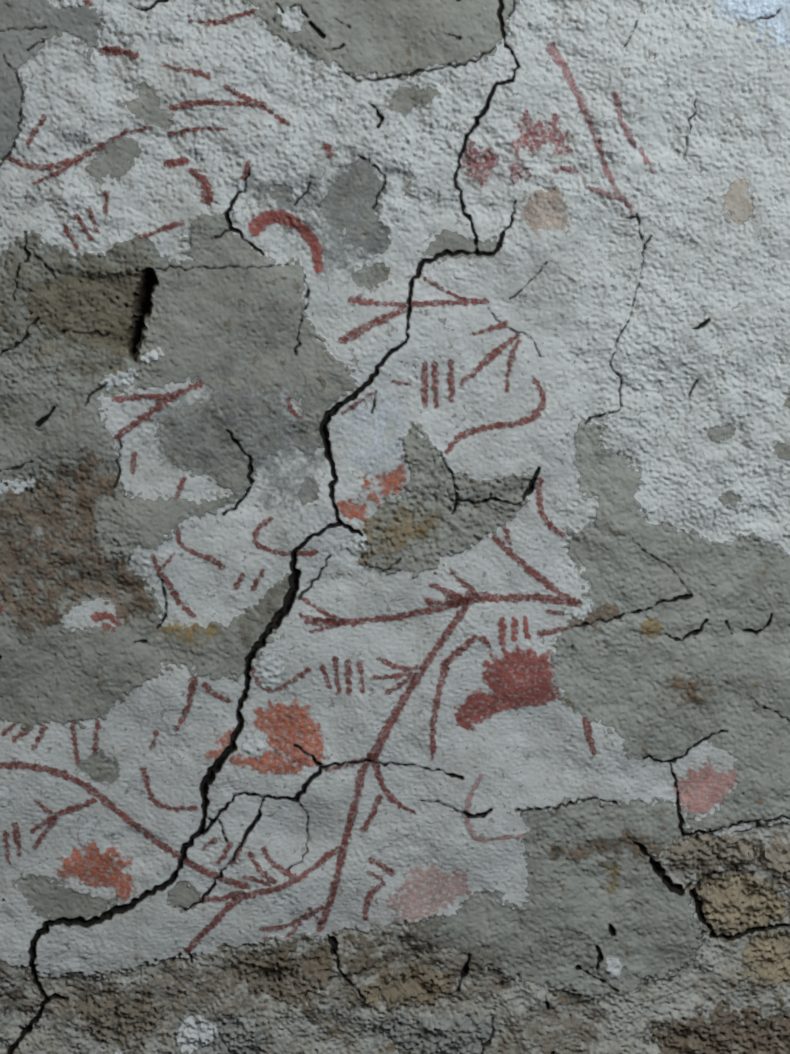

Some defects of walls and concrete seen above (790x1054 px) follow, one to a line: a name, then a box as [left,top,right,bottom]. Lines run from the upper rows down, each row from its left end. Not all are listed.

flaking render [0,0,103,164]
spalling [117,82,174,130]
flaking render [243,0,520,115]
spalling [86,137,141,185]
flaking render [0,210,359,731]
crack [7,0,520,1054]
crack [441,453,541,514]
crack [575,538,693,627]
flaking render [0,420,790,1054]
crack [421,797,617,818]
crack [643,730,790,836]
crack [627,835,790,940]